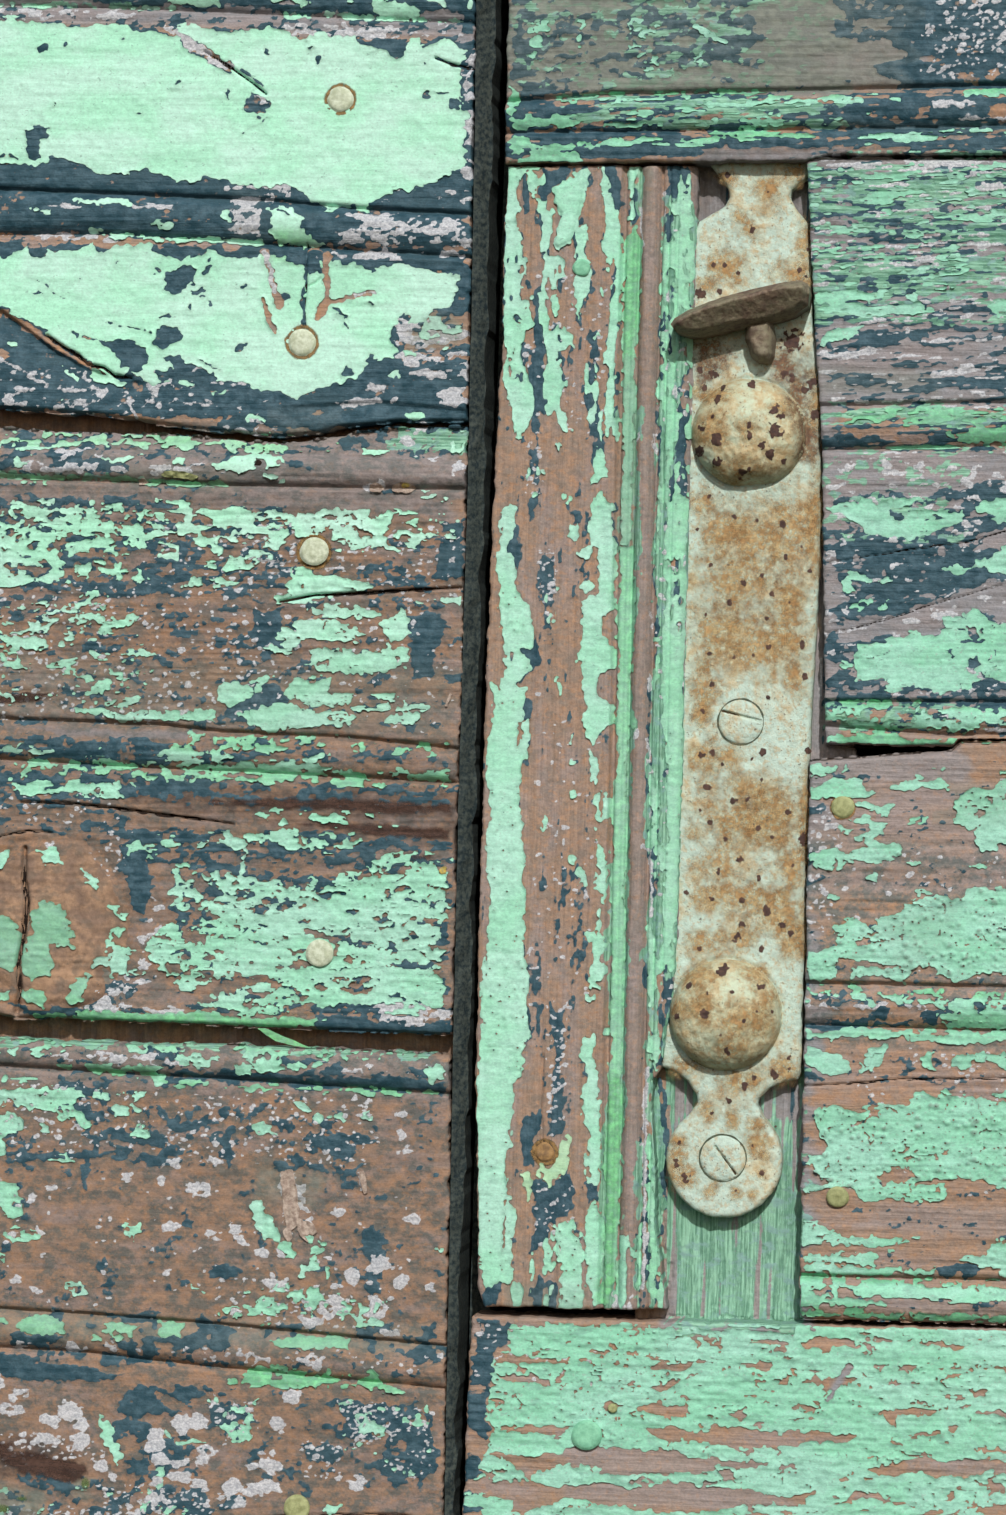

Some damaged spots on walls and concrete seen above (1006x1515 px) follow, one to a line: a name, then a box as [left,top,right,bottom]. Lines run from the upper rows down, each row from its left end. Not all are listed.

peeling [0,414,462,799]
peeling [0,0,473,400]
crack [282,587,455,602]
corrosion [695,253,745,298]
corrosion [733,211,756,239]
corrosion [695,328,821,483]
corrosion [754,164,803,209]
crack [860,531,1005,558]
peeling [0,807,454,1156]
peeling [464,86,1006,1515]
corrosion [671,483,821,1198]
peeling [207,1169,429,1476]